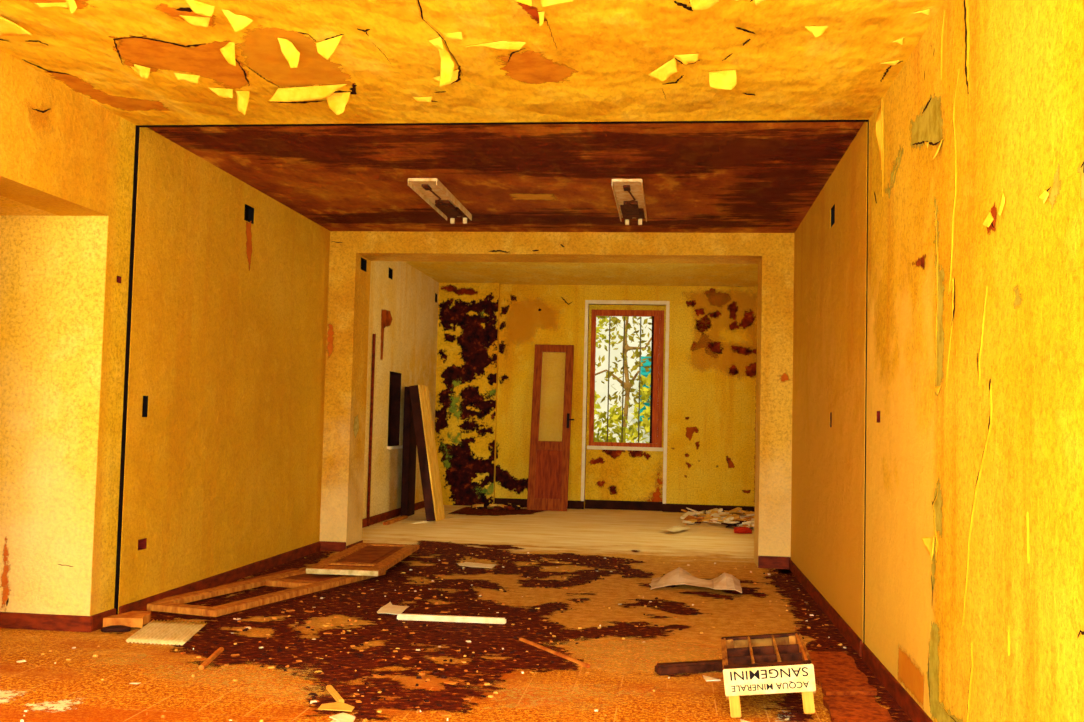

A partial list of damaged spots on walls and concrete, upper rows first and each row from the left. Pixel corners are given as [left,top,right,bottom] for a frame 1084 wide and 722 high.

peeling [22,59,169,111]
peeling [109,0,357,115]
crack [416,0,463,86]
peeling [412,32,578,103]
peeling [514,0,574,48]
peeling [648,54,700,93]
peeling [674,0,720,11]
peeling [709,70,755,95]
peeling [874,94,944,204]
crack [924,0,971,388]
rust [645,472,663,502]
crack [961,285,992,722]